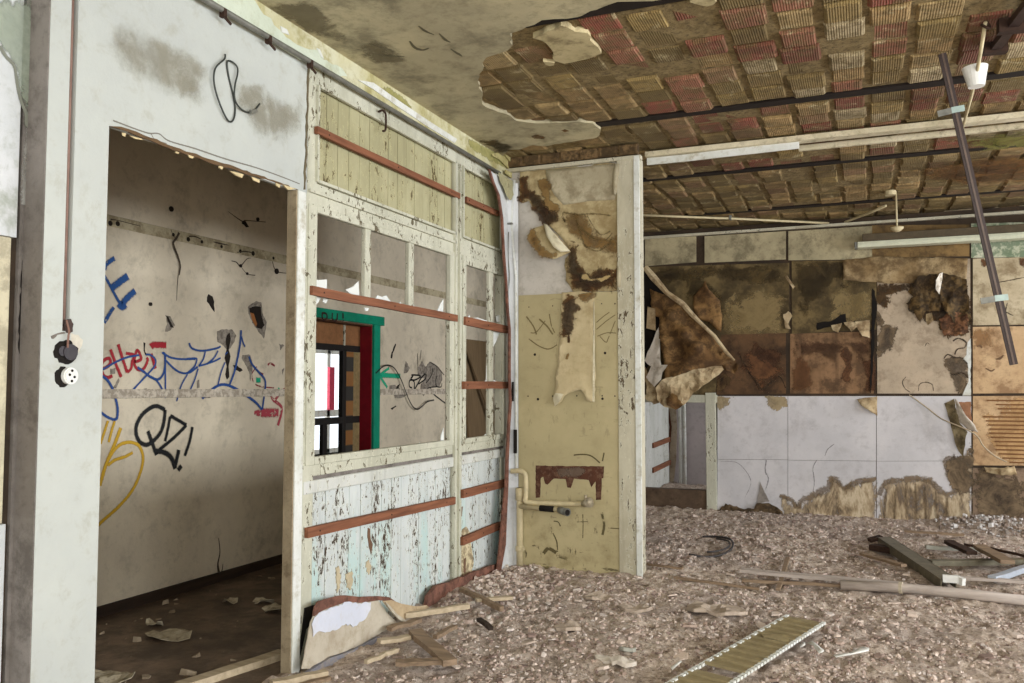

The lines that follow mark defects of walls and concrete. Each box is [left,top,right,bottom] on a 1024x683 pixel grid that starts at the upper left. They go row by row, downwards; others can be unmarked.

spalling [478,0,1024,233]
spalling [248,301,267,338]
peeling [365,528,373,575]
peeling [335,566,353,593]